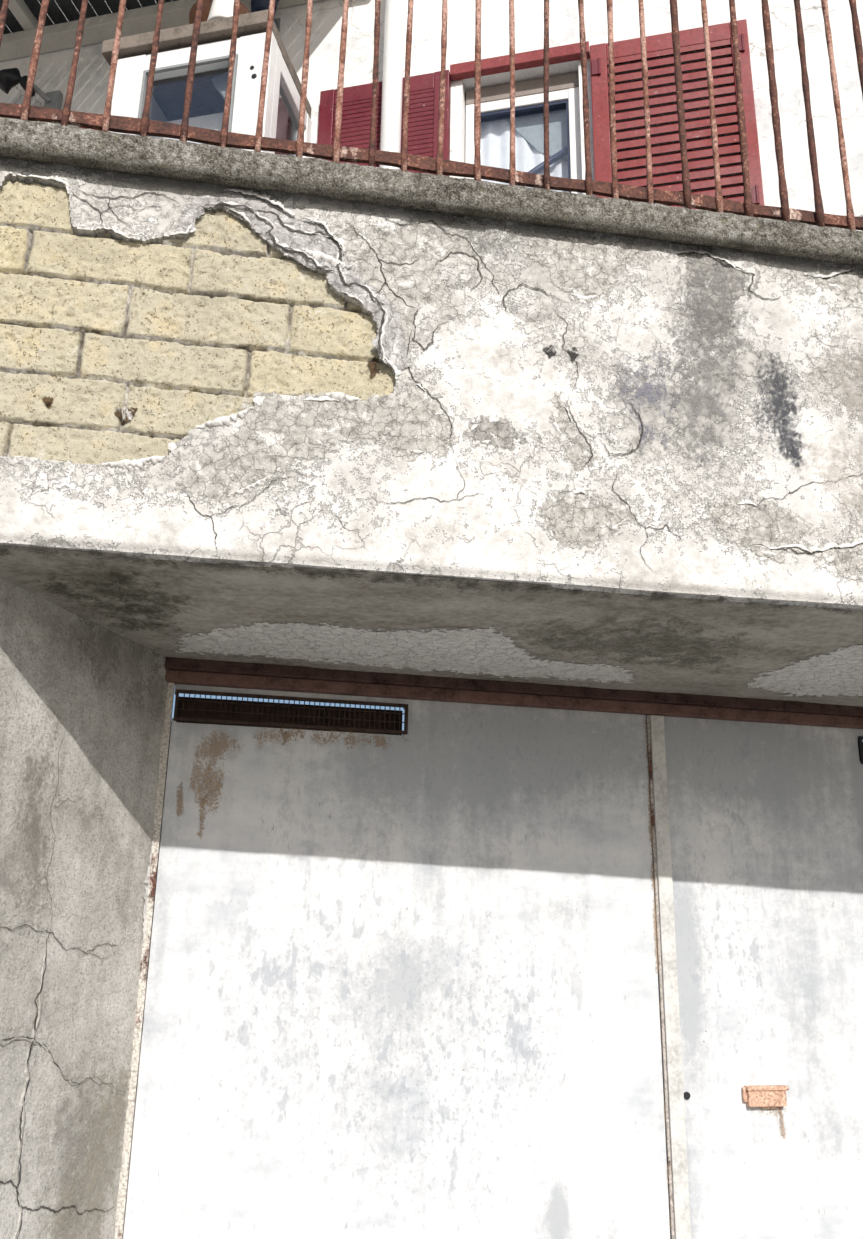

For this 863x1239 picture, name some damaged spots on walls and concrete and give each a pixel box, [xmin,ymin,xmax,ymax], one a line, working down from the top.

spalling [18,174,70,194]
peeling [102,188,528,505]
water stain [758,355,805,478]
crack [182,475,298,552]
crack [749,538,863,555]
corrosion [177,733,239,836]
crack [0,736,126,1239]